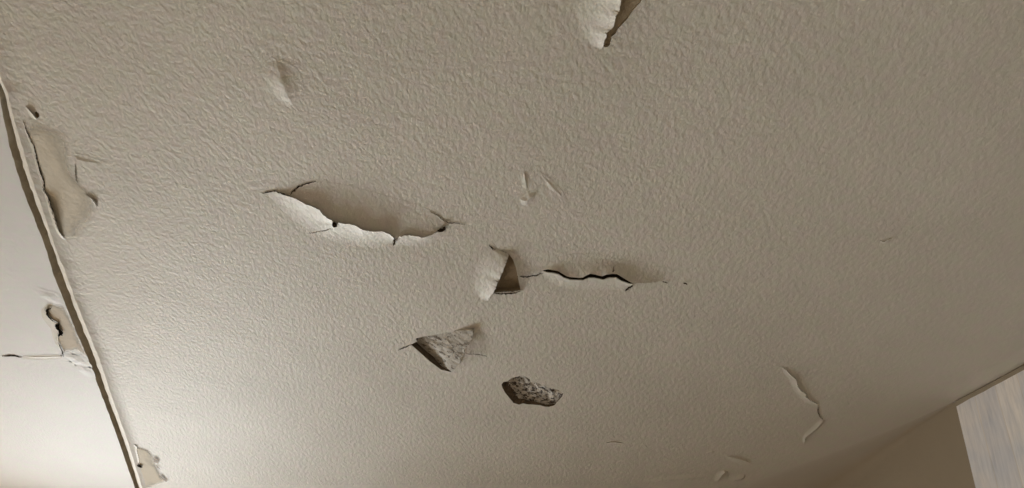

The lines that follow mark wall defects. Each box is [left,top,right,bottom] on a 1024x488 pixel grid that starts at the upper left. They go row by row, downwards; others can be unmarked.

peeling [564,0,641,50]
peeling [22,106,106,244]
peeling [264,181,463,251]
peeling [472,246,533,302]
crack [517,253,687,293]
peeling [34,288,96,379]
spalling [399,329,493,374]
spalling [502,375,563,407]
peeling [780,367,824,444]
peeling [134,444,167,487]